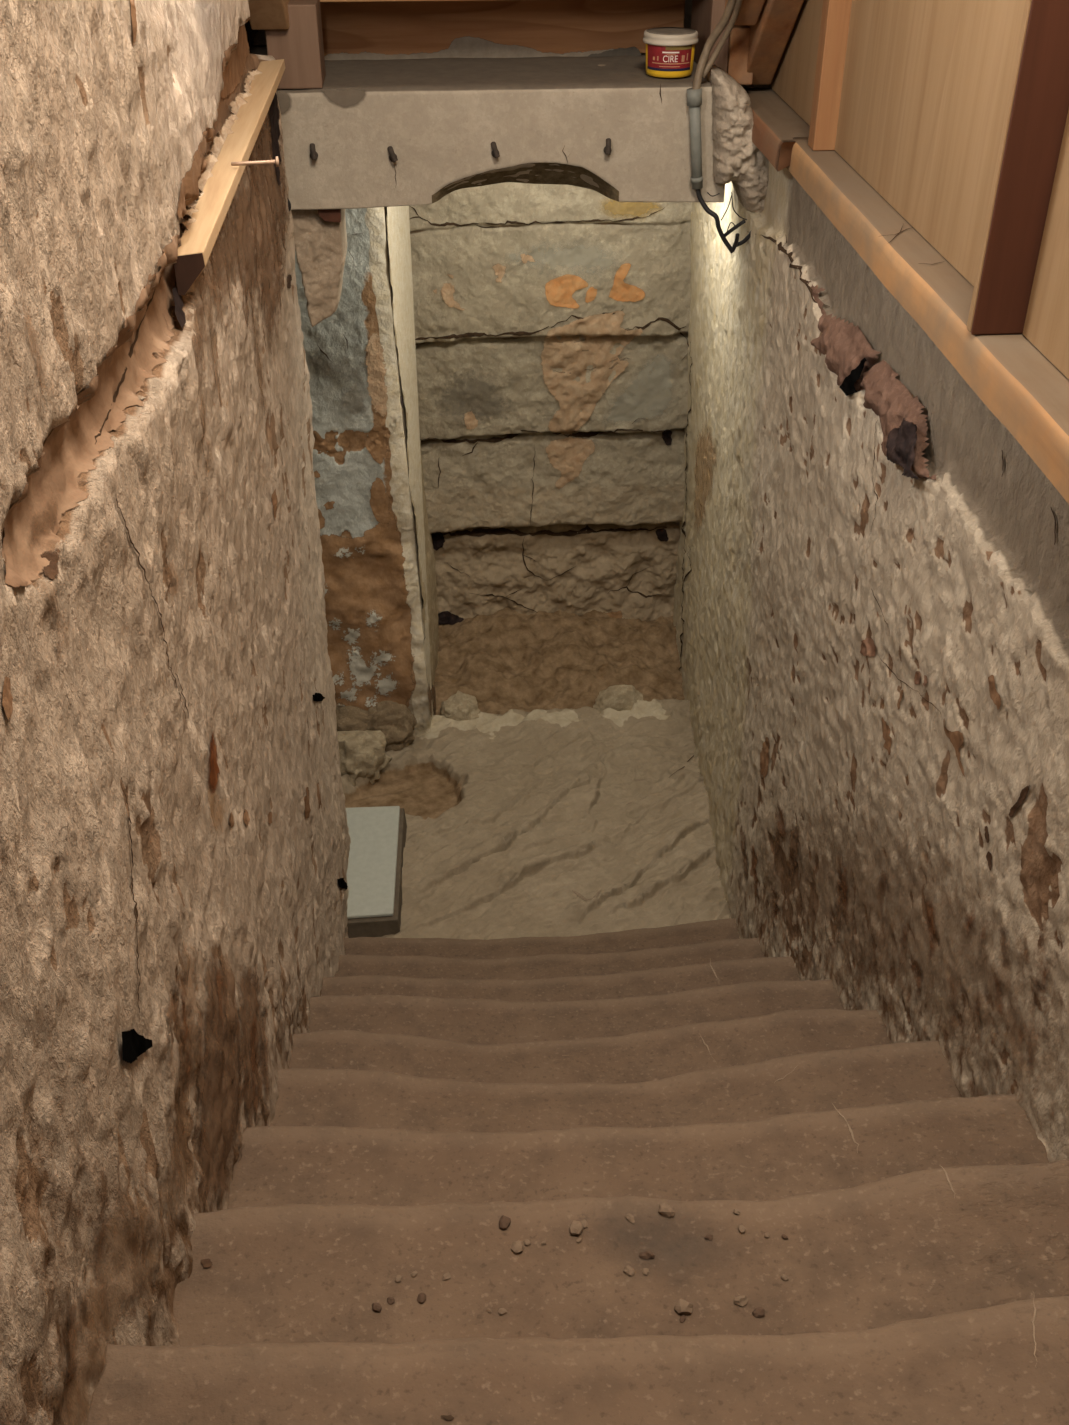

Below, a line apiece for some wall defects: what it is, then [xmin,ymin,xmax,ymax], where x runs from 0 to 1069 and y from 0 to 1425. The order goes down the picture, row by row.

flaking render [220,17,250,98]
flaking render [1,128,215,587]
flaking render [805,271,936,480]
peeling [313,333,415,711]
damp [740,806,799,944]
damp [912,903,935,993]
damp [57,946,269,1425]